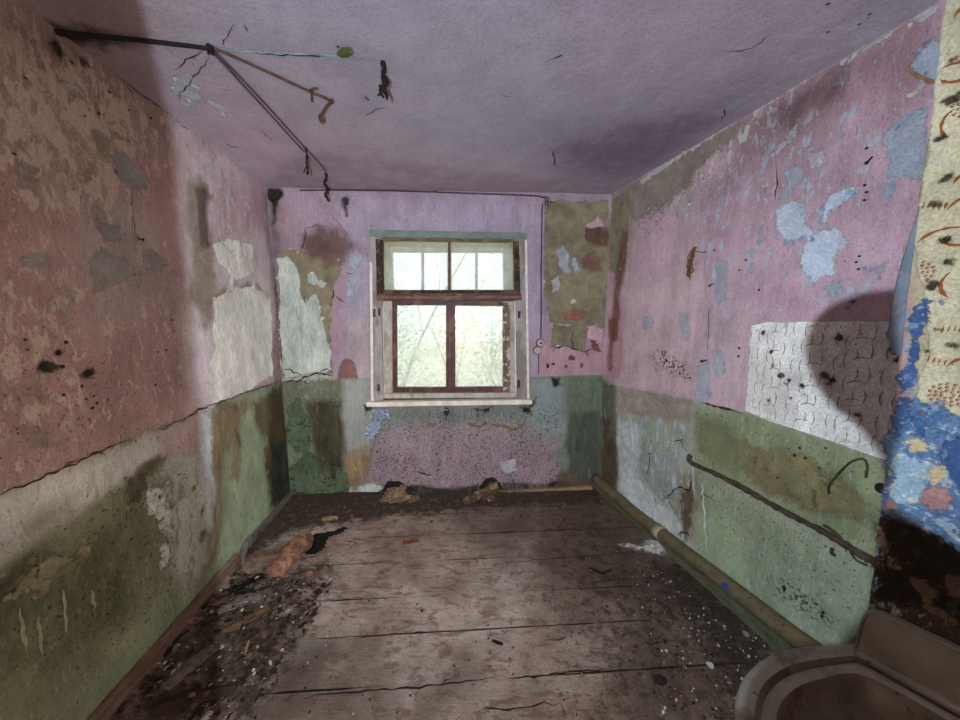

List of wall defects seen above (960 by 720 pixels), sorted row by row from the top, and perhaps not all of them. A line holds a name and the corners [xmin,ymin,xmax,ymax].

crack [110,26,330,130]
leakage [196,187,209,246]
leakage [307,228,362,266]
peeling [542,121,740,352]
peeling [738,149,856,299]
crack [0,440,128,495]
spalling [124,456,177,574]
peeling [187,179,343,563]
leakage [268,388,290,506]
leakage [309,401,344,478]
leakage [738,440,862,519]
peeling [874,297,960,553]